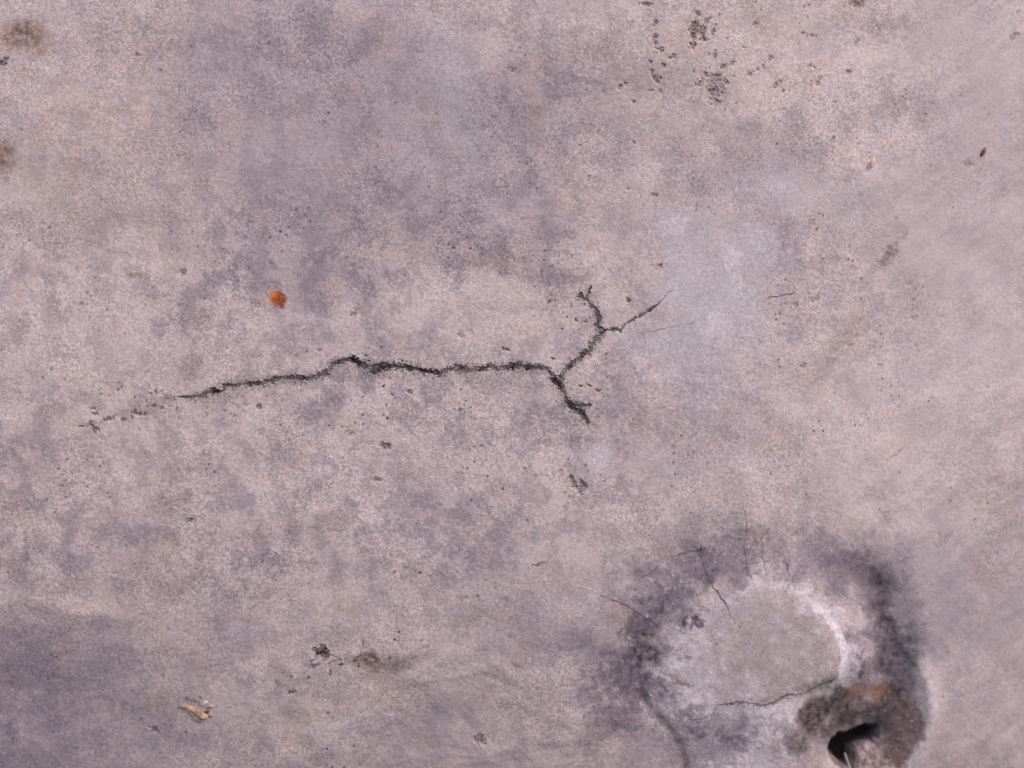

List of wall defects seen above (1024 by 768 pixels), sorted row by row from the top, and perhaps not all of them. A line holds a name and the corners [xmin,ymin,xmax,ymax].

corrosion [266,286,290,310]
crack [161,283,701,428]
crack [742,502,790,580]
crack [640,544,736,624]
water stain [560,505,960,768]